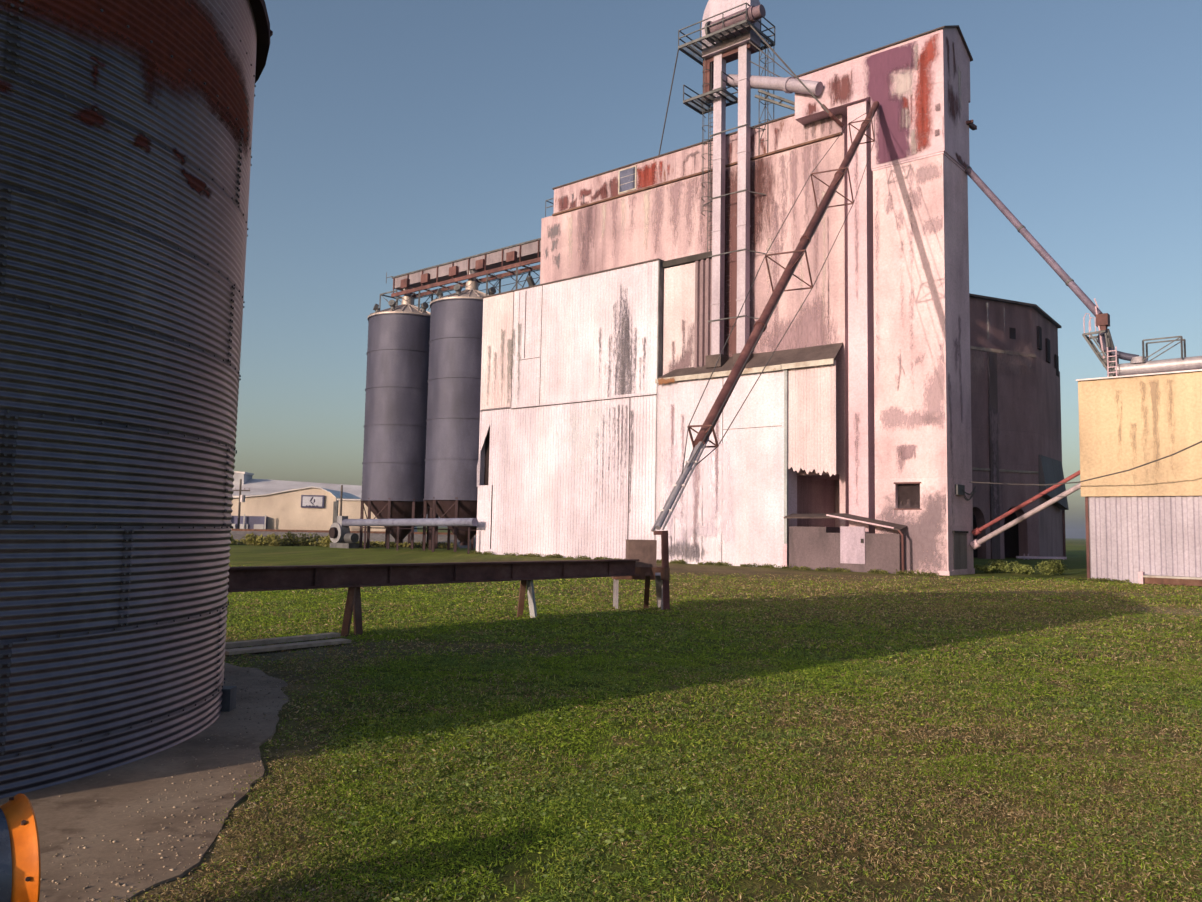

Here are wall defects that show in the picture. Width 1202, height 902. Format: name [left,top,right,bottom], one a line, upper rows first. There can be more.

rust [2,0,250,153]
rust [173,148,211,198]
leakage [487,324,521,402]
leakage [596,287,646,513]
leakage [880,318,984,448]
leakage [669,406,704,562]